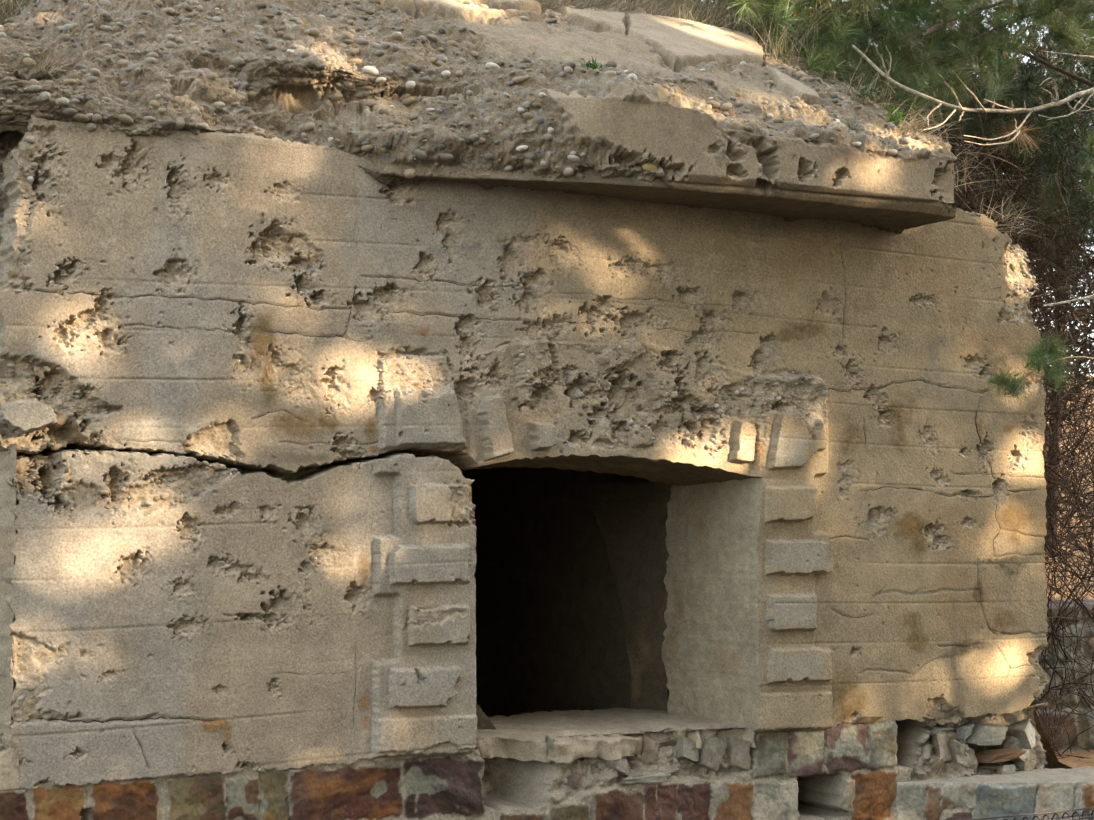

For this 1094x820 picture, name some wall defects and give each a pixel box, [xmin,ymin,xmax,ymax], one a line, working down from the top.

peeling [413,0,539,24]
spalling [606,137,852,201]
spalling [925,157,958,219]
spalling [245,179,409,335]
spalling [996,240,1038,331]
spalling [0,124,369,636]
spalling [366,228,829,467]
crack [16,410,479,530]
crack [828,379,1047,677]
spalling [166,614,213,643]
spalling [342,580,382,617]
spalling [921,693,966,725]